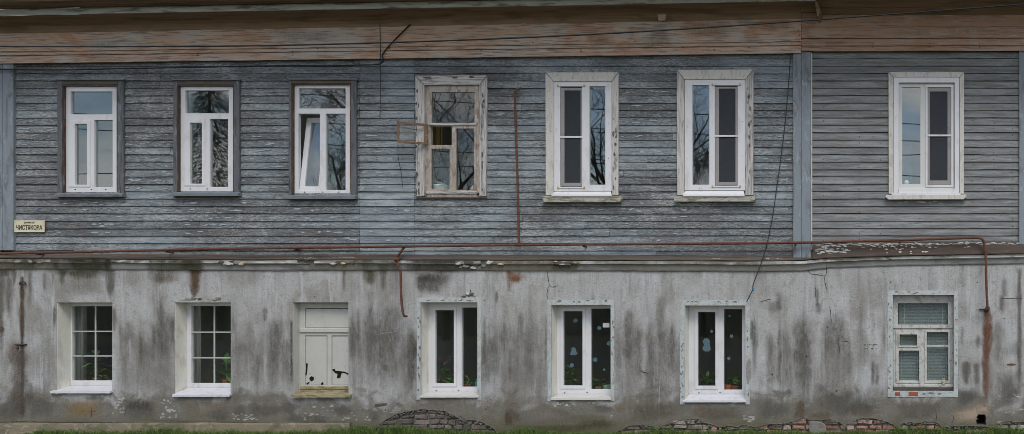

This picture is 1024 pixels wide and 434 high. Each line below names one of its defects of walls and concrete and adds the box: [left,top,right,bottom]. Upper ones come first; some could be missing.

peeling [815,241,1019,254]
rust [13,277,26,414]
leakage [958,362,987,420]
rust [984,311,992,395]
leakage [1002,270,1021,396]